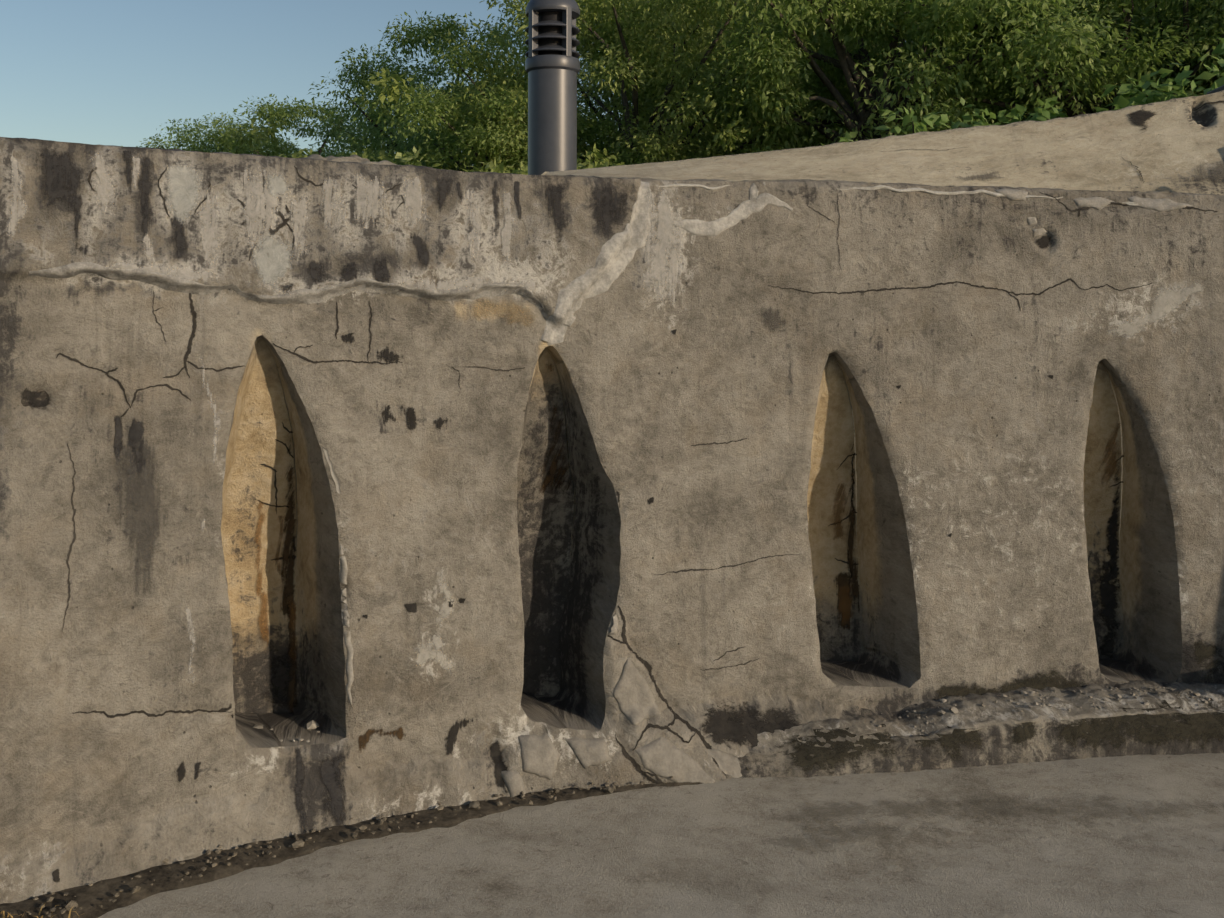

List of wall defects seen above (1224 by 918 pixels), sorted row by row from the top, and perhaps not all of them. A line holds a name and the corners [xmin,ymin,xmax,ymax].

leakage [36,147,219,283]
leakage [244,167,535,294]
leakage [545,183,569,242]
crack [768,190,1152,311]
crack [56,290,243,417]
crack [62,444,76,630]
leakage [114,416,158,589]
rust [256,444,298,715]
rust [834,444,860,630]
crack [73,704,233,718]
crack [608,606,727,784]
mould [701,700,801,749]